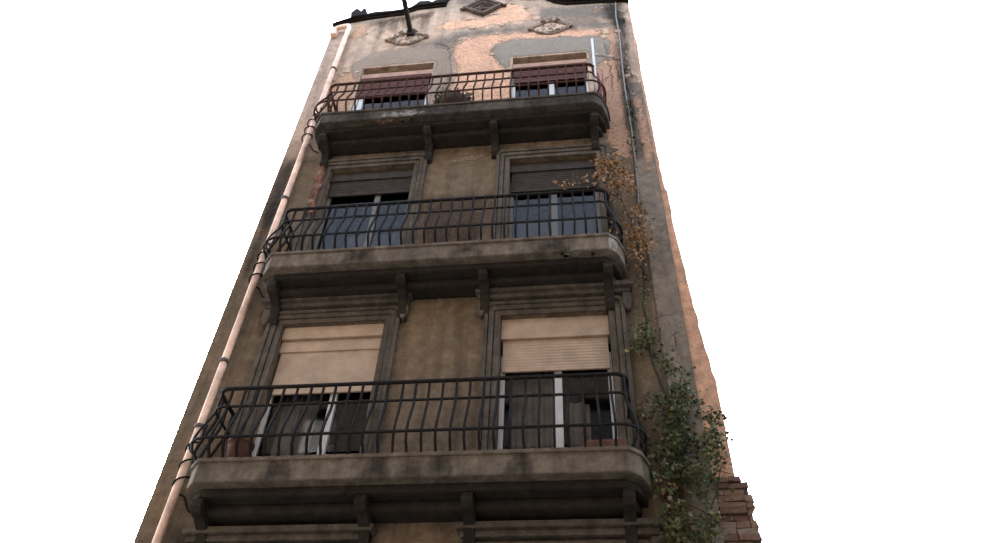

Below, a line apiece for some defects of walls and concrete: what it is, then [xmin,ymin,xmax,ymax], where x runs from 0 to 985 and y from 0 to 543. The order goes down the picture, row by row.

flaking render [435,1,653,170]